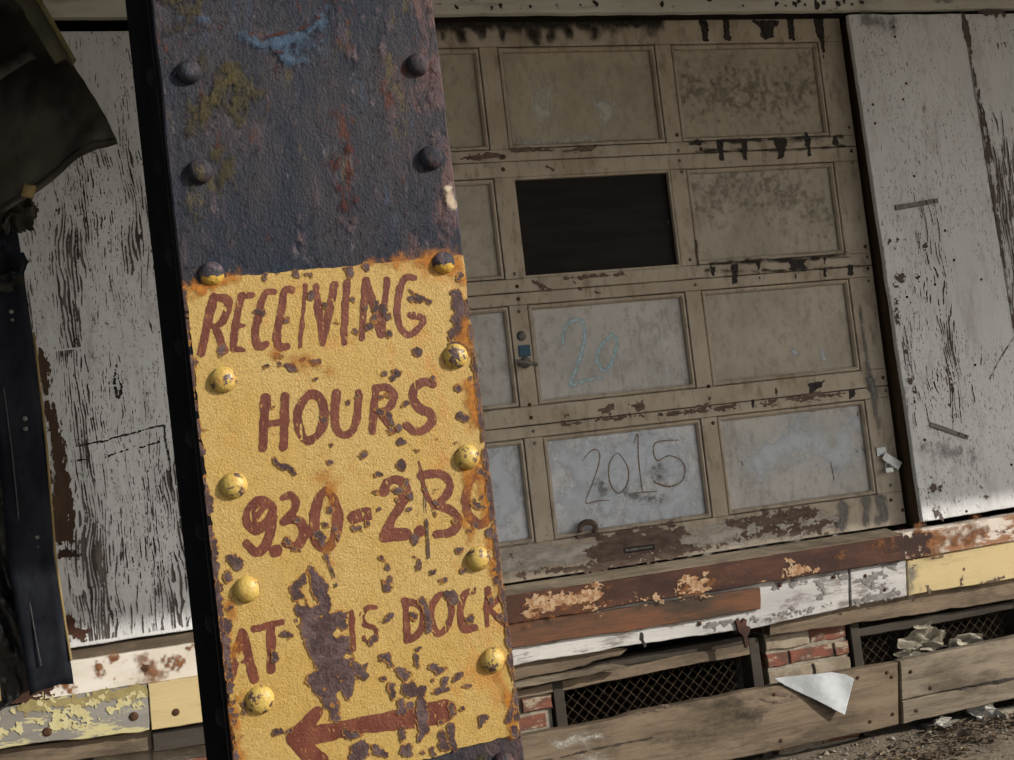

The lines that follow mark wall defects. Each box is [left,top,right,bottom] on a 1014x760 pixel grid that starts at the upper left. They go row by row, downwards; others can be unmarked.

damp [435,20,664,45]
peeling [991,104,1014,313]
rust [393,250,438,269]
peeling [24,50,191,642]
peeling [893,192,975,459]
rust [465,381,483,427]
rust [461,462,490,540]
peeling [447,271,838,739]
rust [95,652,120,677]
rust [139,644,194,682]
peeling [279,505,472,760]
peeling [0,683,148,740]